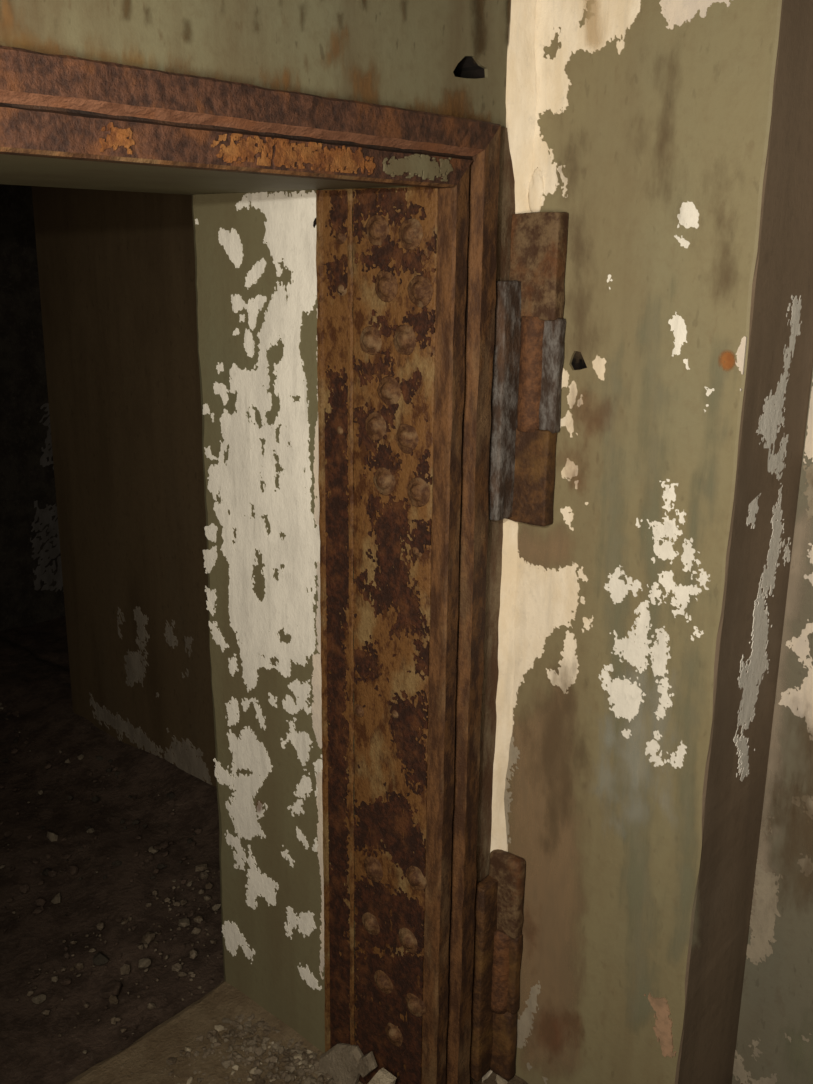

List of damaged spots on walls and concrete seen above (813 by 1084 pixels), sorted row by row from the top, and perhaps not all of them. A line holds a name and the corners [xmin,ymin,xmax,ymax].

rust [99,122,135,154]
rust [211,133,376,175]
rust [323,188,437,299]
peeling [529,0,641,213]
peeling [674,201,699,248]
peeling [659,0,733,30]
peeling [89,190,325,991]
rust [324,306,435,1084]
peeling [504,549,594,844]
peeling [598,479,711,769]
peeling [733,295,802,781]
peeling [778,619,813,740]